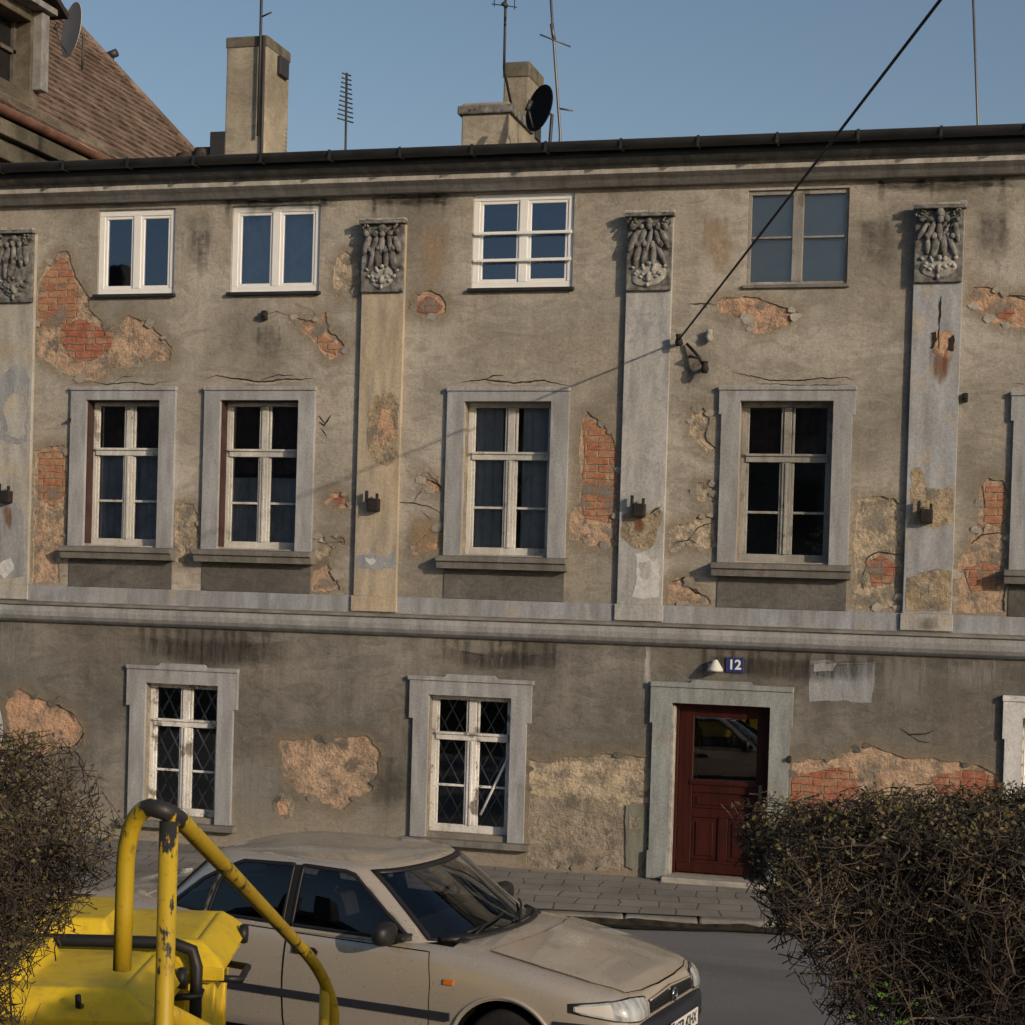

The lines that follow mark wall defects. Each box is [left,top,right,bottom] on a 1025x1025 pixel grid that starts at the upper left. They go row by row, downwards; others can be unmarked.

flaking render [35,248,173,384]
flaking render [714,293,804,336]
crack [935,297,943,348]
crack [206,374,317,385]
crack [459,375,569,387]
peeling [367,392,399,466]
flaking render [566,403,719,606]
flaking render [850,467,1011,616]
flaking render [5,687,86,758]
flaking render [278,733,383,811]
flaking render [523,750,651,873]
flaking render [788,741,1003,831]